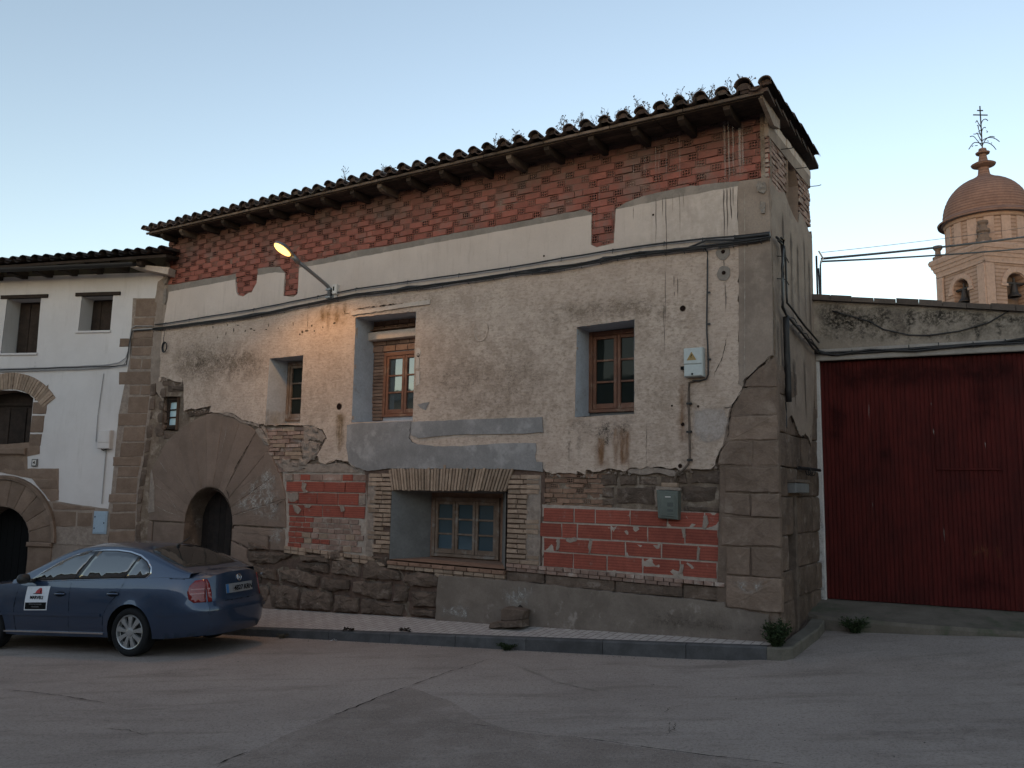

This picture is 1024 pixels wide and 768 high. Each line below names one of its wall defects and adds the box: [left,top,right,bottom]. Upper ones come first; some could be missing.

spalling [544,457,720,512]